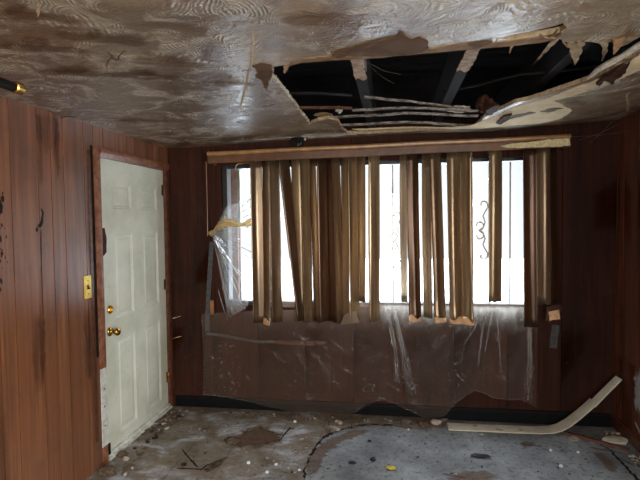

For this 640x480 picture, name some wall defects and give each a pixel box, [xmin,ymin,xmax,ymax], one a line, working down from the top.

spalling [252,25,640,131]
spalling [224,426,291,448]